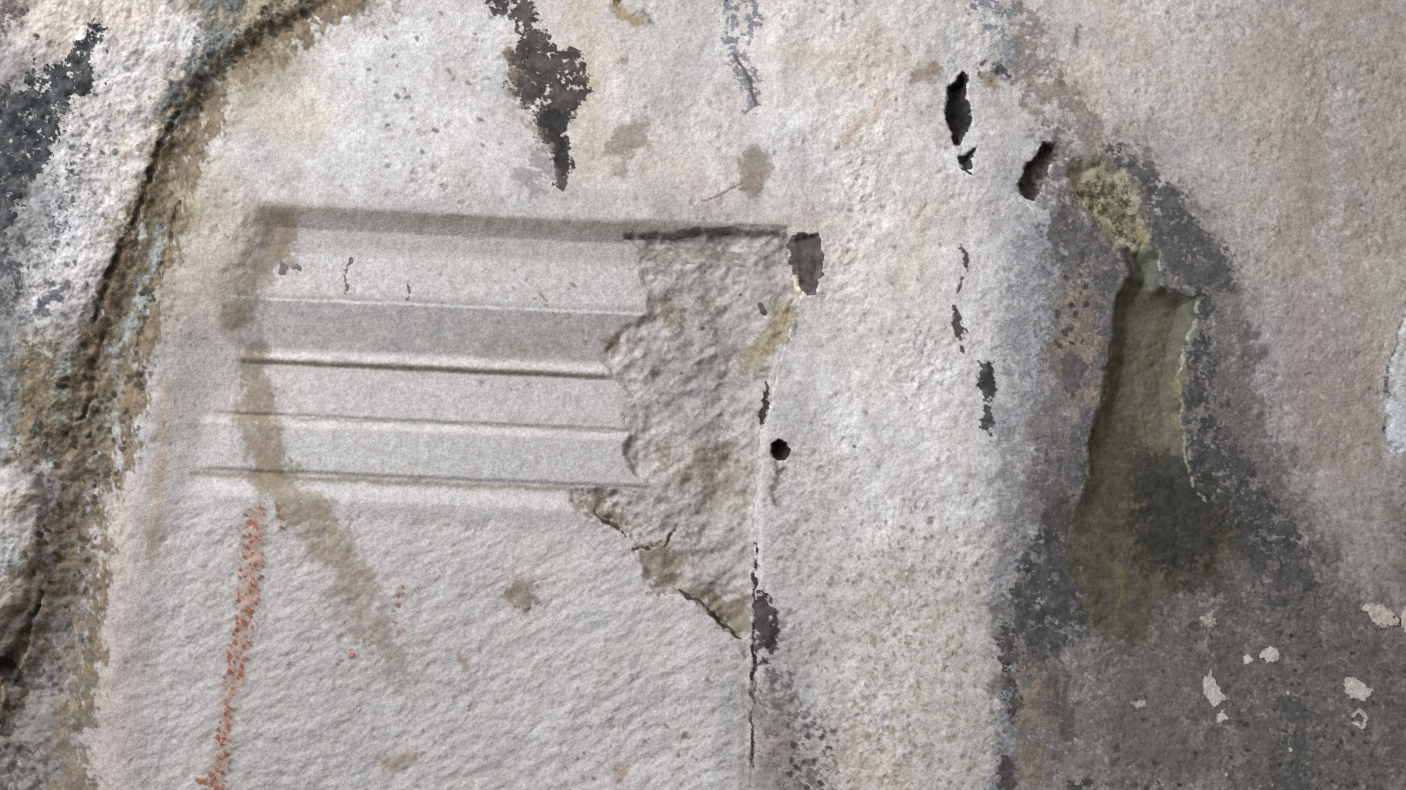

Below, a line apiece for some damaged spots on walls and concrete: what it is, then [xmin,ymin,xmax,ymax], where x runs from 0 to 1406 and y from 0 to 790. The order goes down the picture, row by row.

leakage [484,0,594,197]
leakage [909,62,939,83]
leakage [0,0,372,790]
spalling [569,229,824,639]
leakage [951,0,1406,790]